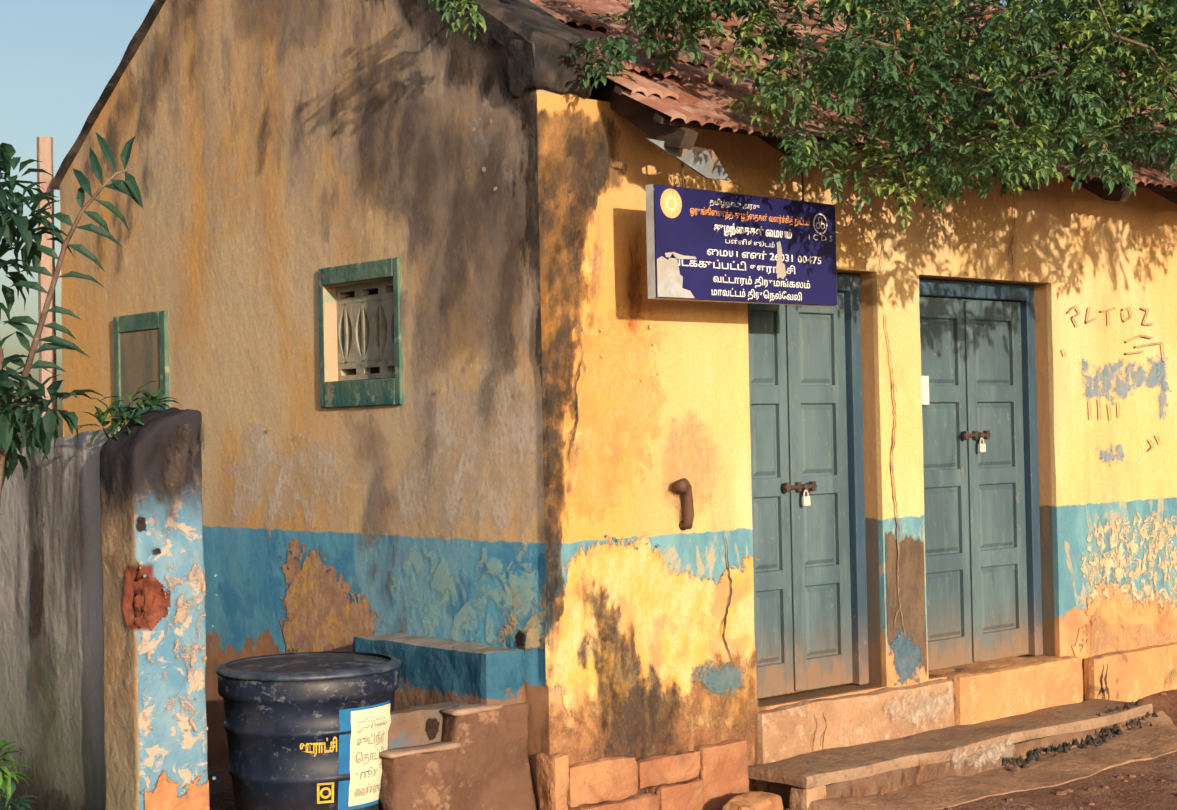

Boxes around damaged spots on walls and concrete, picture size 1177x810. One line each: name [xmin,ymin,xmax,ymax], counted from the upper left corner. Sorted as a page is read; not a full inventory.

leakage [359,0,626,641]
spalling [137,517,146,532]
spalling [122,548,218,729]
peeling [164,692,208,737]
peeling [224,423,350,533]
peeling [279,538,385,653]
peeling [496,534,759,734]
leakage [549,582,766,792]
crack [721,539,734,664]
crack [885,315,905,631]
peeling [1071,511,1177,695]